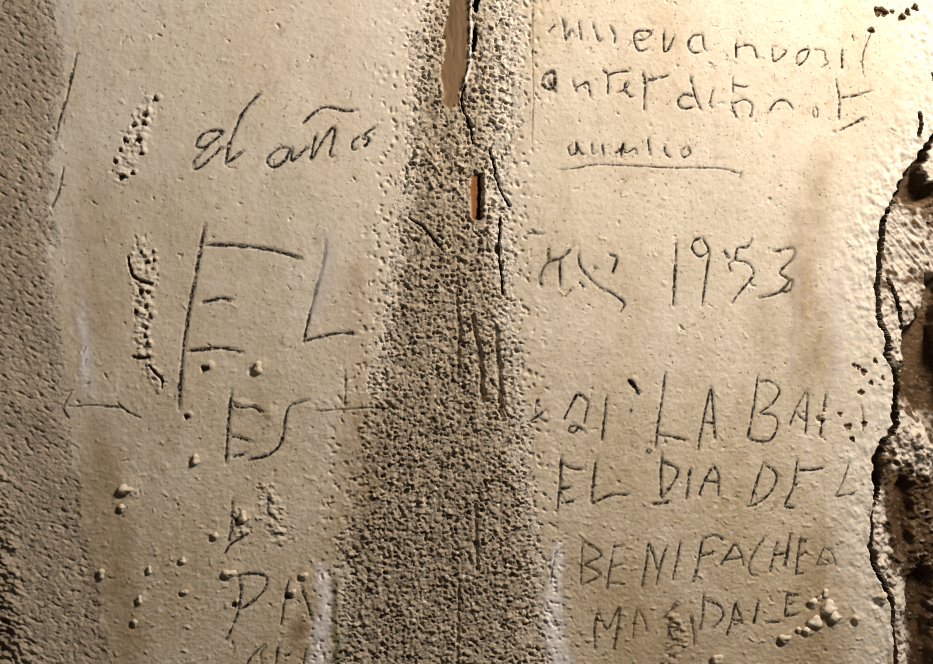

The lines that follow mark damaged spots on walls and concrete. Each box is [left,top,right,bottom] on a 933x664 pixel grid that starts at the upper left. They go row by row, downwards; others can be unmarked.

crack [472,0,481,52]
flaking render [873,5,919,21]
crack [460,86,512,295]
flaking render [325,0,552,664]
flaking render [852,143,933,664]